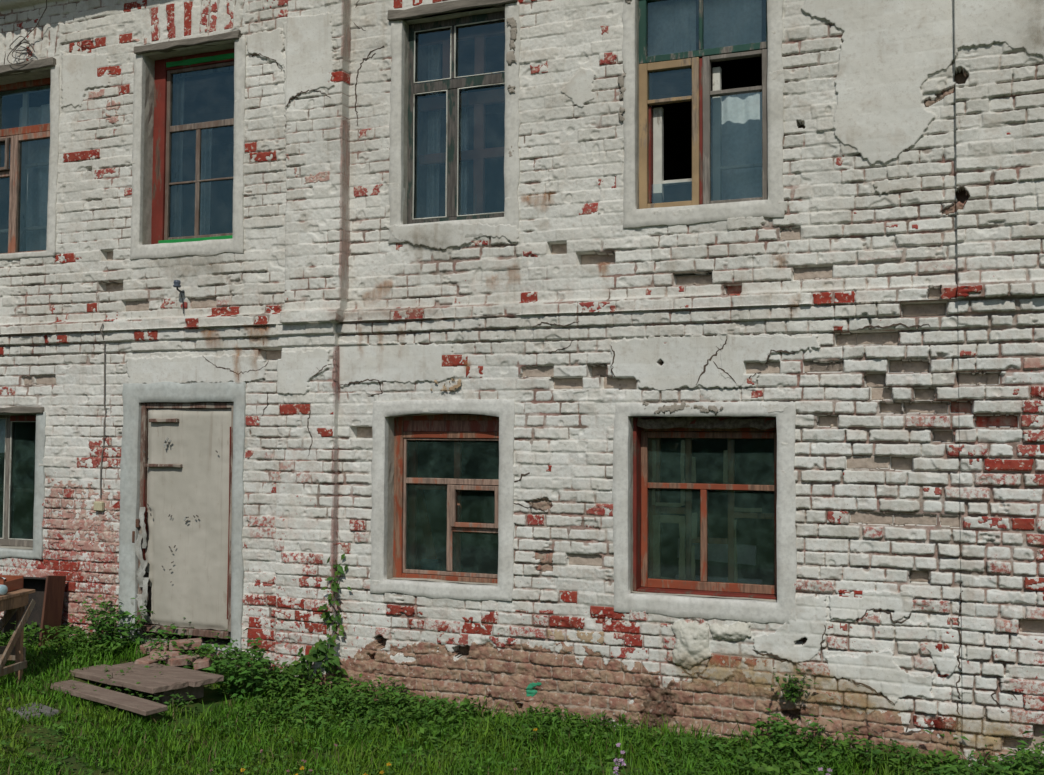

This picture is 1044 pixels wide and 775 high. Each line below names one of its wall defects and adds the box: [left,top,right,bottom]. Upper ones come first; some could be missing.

crack [285,0,384,128]
peeling [813,291,855,305]
spalling [902,285,982,316]
flaking render [520,333,843,416]
crack [696,336,795,385]
spalling [834,326,899,345]
spalling [864,359,1044,487]
peeling [77,437,121,468]
peeling [35,478,120,636]
spalling [827,510,1044,561]
crack [857,608,912,624]
spalling [297,571,1044,767]